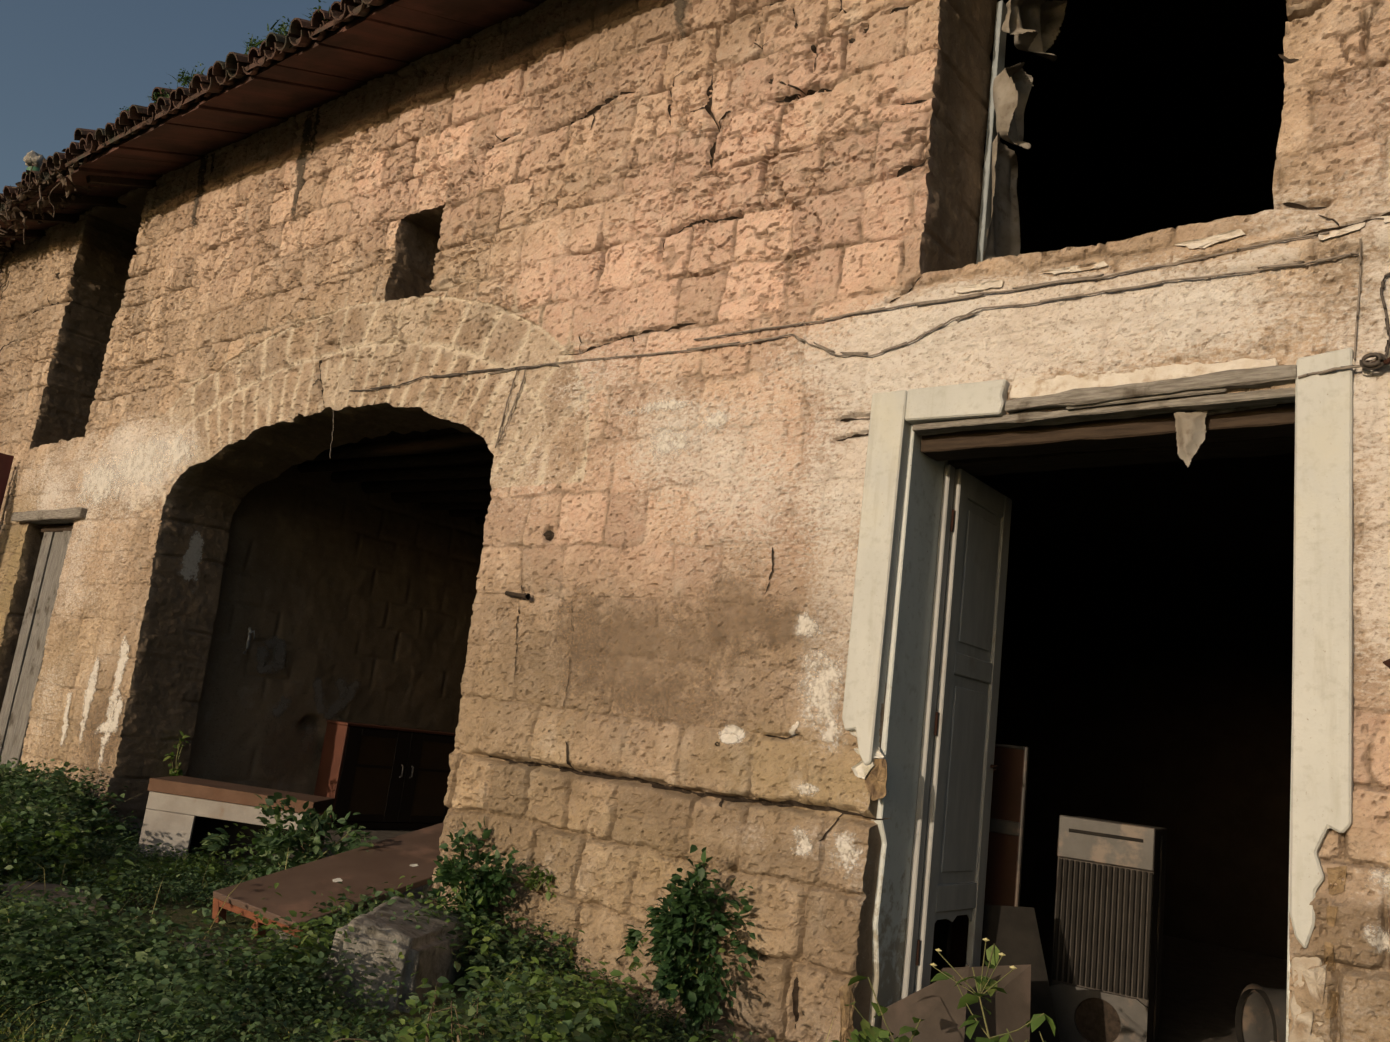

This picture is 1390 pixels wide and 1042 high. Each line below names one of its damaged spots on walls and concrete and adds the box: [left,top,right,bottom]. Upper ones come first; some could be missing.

damp [291,108,320,218]
crack [556,92,634,132]
crack [667,70,731,168]
damp [796,612,820,636]
damp [60,636,129,772]
damp [789,652,843,752]
spalling [1296,866,1347,1035]